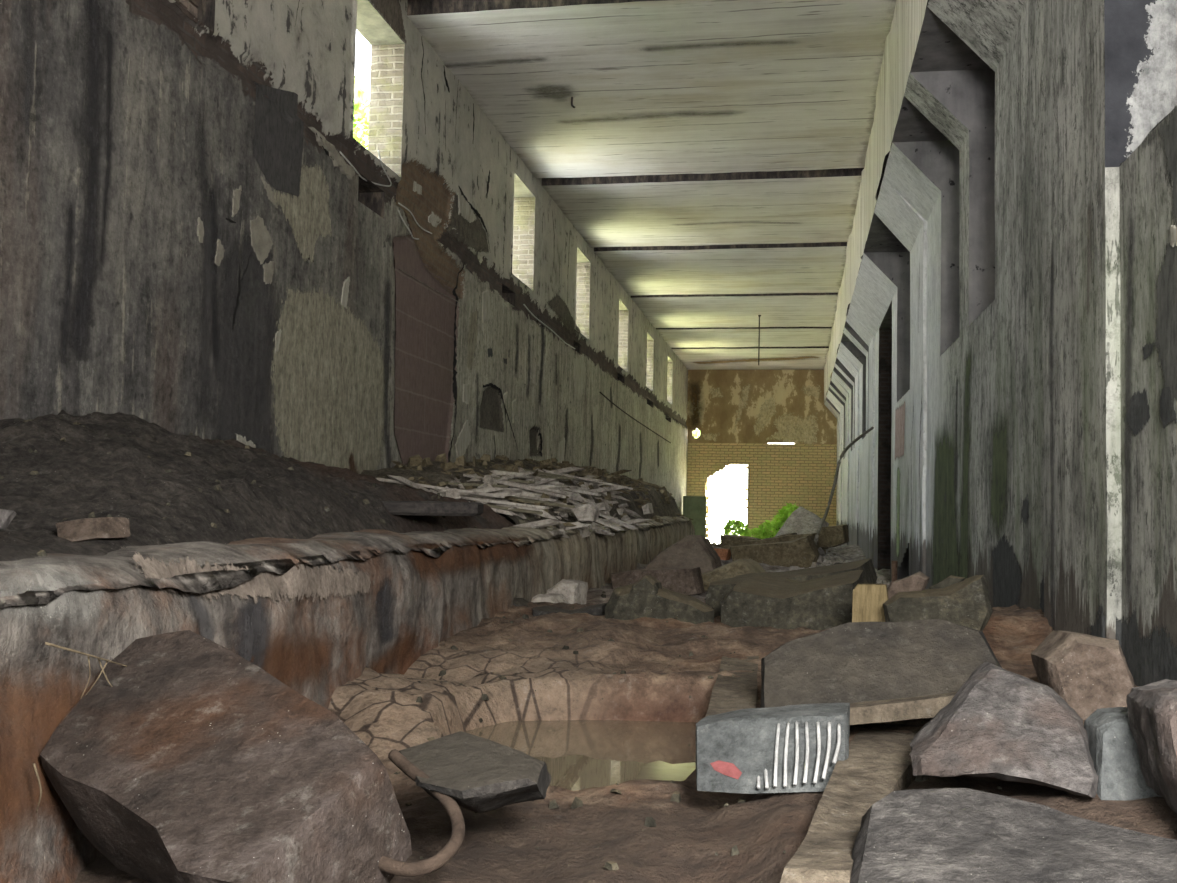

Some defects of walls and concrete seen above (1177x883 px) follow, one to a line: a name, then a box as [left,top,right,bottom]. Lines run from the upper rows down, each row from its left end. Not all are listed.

spalling [371,0,406,43]
damp [61,0,112,416]
peeling [197,217,225,266]
damp [200,126,277,454]
peeling [250,216,275,284]
peeling [261,127,355,263]
peeling [271,157,516,474]
damp [955,353,971,579]
damp [990,417,1008,537]
damp [1125,219,1133,604]
peeling [1124,0,1177,436]
peeling [1087,604,1177,686]